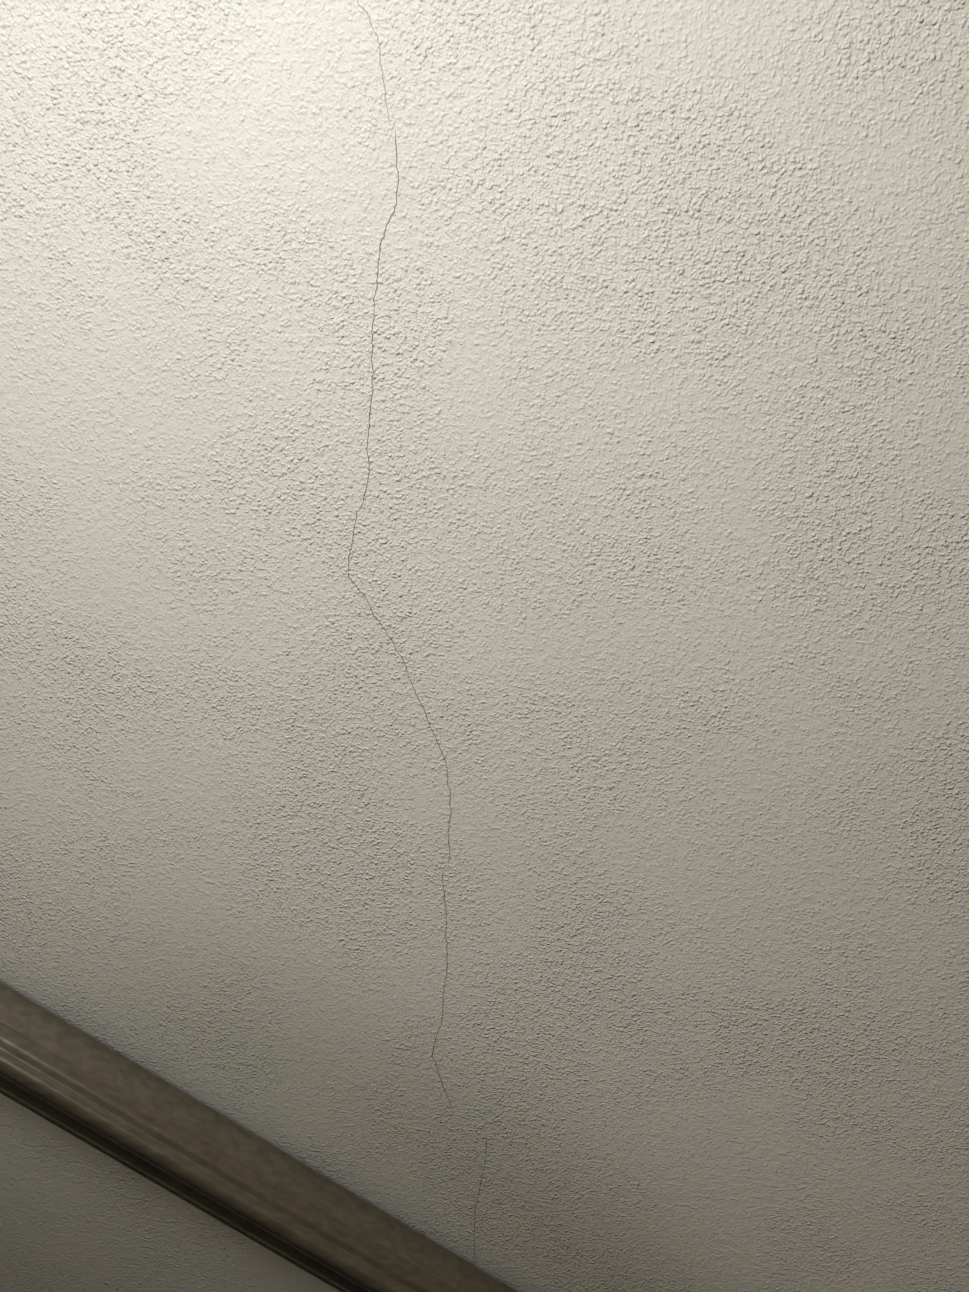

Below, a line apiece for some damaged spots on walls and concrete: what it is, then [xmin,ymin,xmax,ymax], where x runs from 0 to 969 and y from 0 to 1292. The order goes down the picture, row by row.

crack [348,0,453,1109]